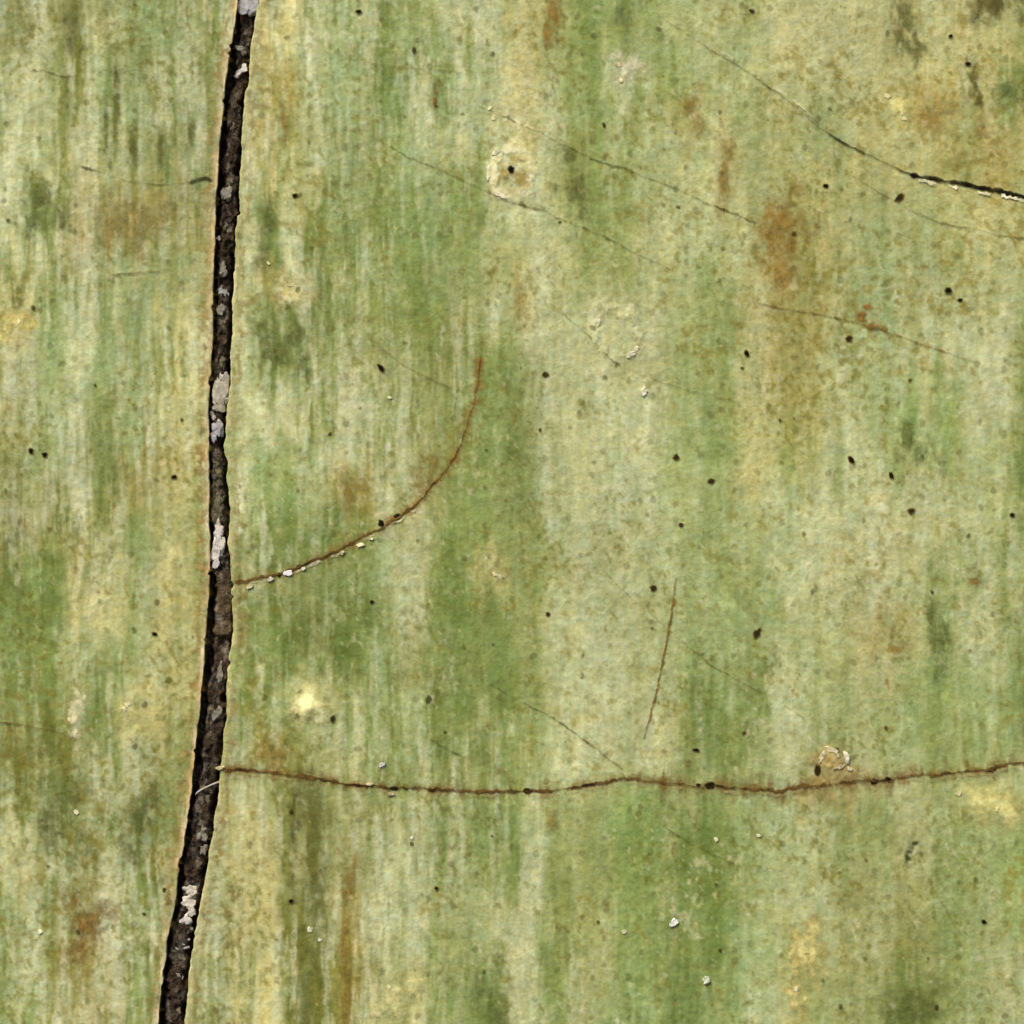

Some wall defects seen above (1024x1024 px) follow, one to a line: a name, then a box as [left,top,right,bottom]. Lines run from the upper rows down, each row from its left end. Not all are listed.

crack [725,56,864,154]
crack [892,166,1024,202]
crack [152,0,641,1024]
crack [649,762,1024,800]